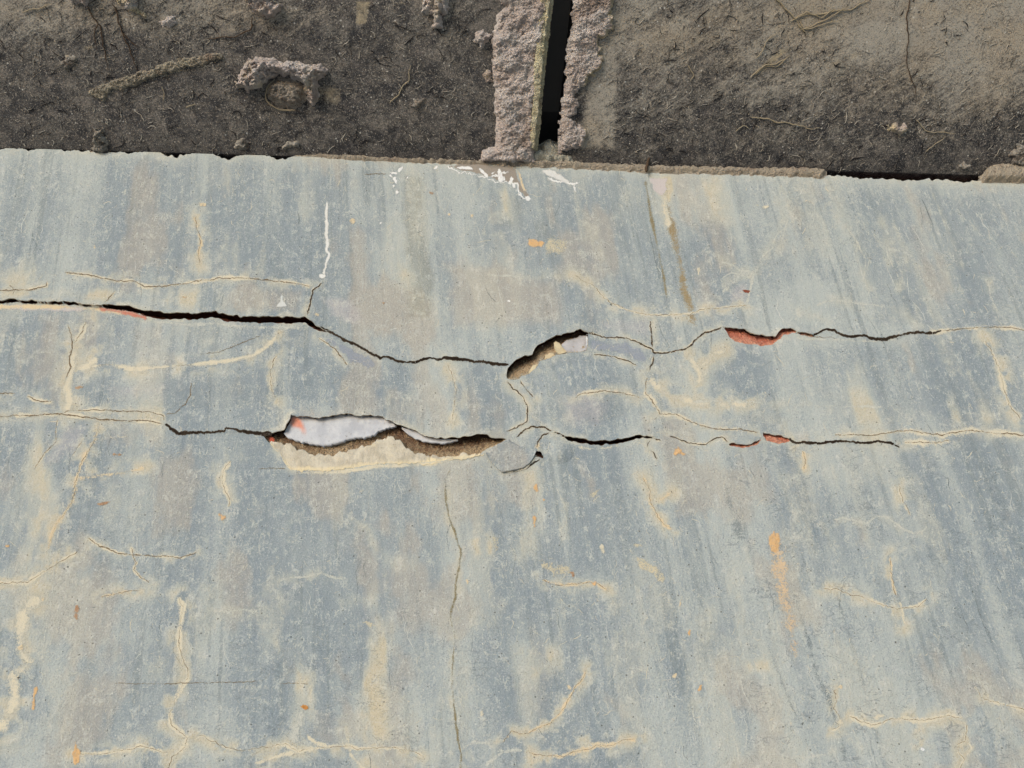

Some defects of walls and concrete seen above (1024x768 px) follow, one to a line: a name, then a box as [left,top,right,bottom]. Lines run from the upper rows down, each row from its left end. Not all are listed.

crack [0,271,758,468]
flaking render [507,329,647,380]
flaking render [723,327,813,346]
crack [796,324,1024,343]
flaking render [264,413,543,475]
flaking render [729,432,790,448]
crack [789,426,1024,448]
crack [443,468,463,768]